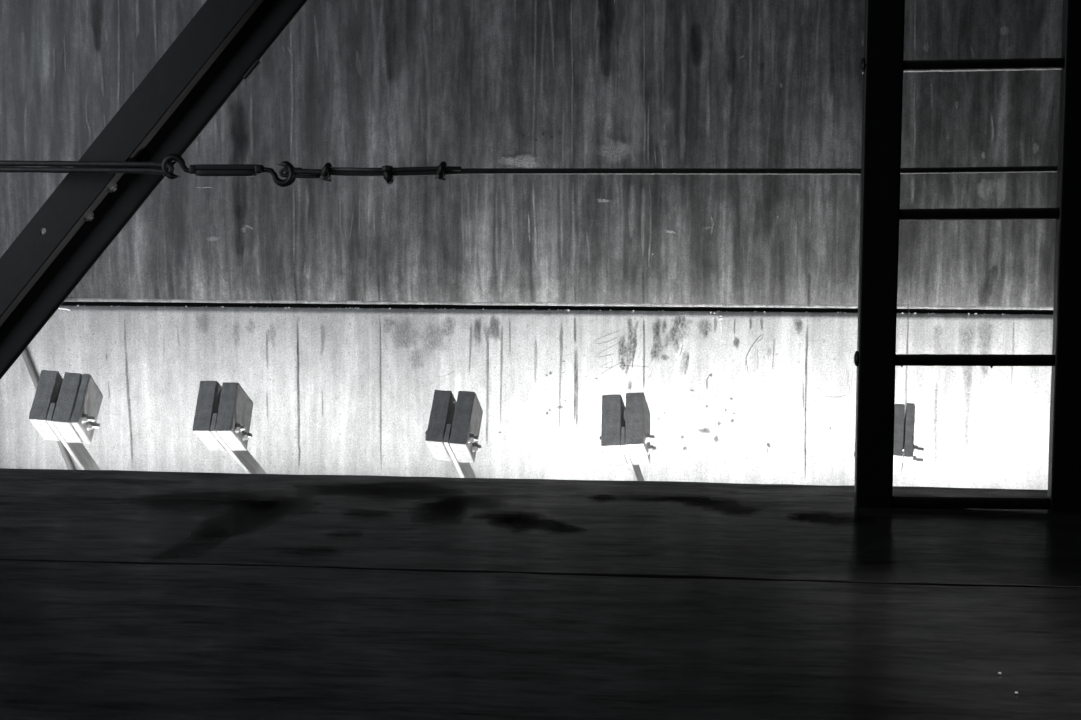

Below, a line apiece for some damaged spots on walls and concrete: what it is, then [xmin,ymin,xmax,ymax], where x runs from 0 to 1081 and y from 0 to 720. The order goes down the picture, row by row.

water stain [599,0,612,76]
water stain [232,108,246,160]
water stain [619,319,684,371]